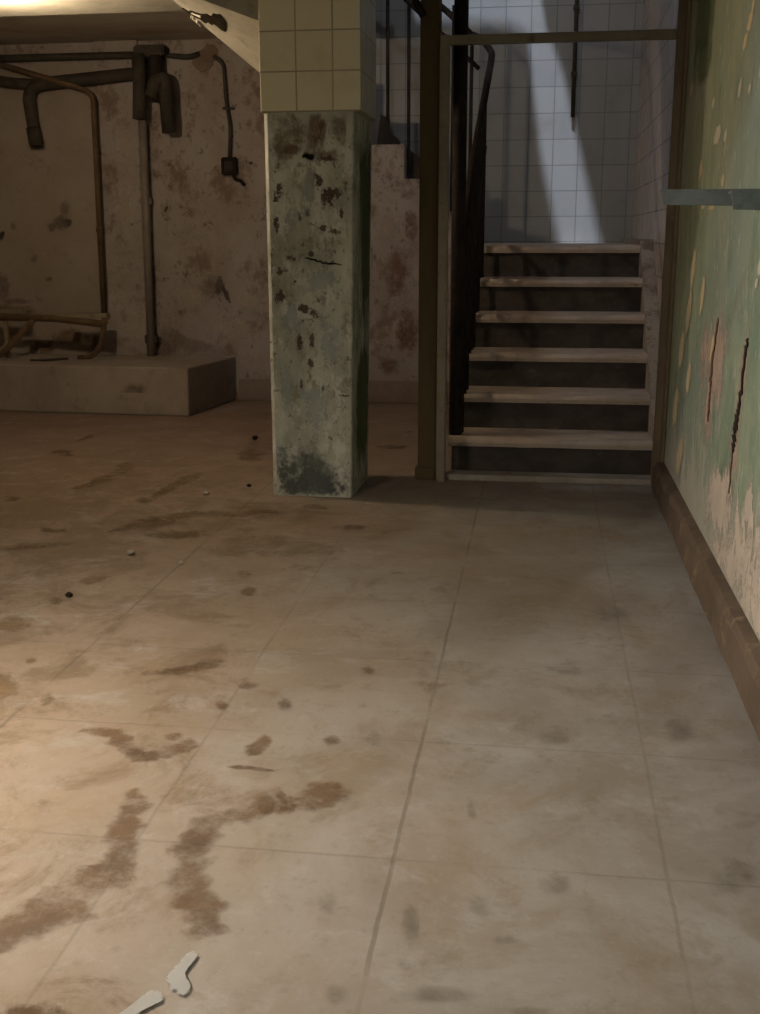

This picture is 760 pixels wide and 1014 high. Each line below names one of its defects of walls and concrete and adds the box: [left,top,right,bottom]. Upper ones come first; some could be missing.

water stain [109,510,275,538]
water stain [280,447,344,509]
peeling [672,249,705,427]
crack [696,305,750,522]
peeling [700,462,760,641]